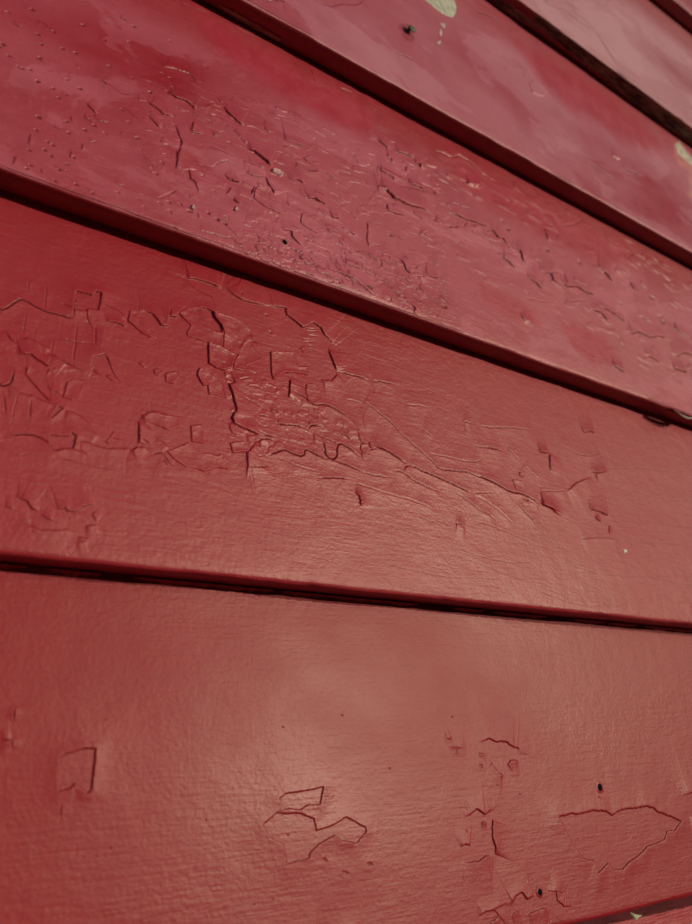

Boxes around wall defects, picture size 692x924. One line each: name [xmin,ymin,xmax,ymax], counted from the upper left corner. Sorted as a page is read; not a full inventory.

peeling [0,0,692,381]
crack [541,187,619,247]
peeling [0,472,107,556]
peeling [124,252,399,506]
crack [255,374,692,621]
peeling [587,484,616,535]